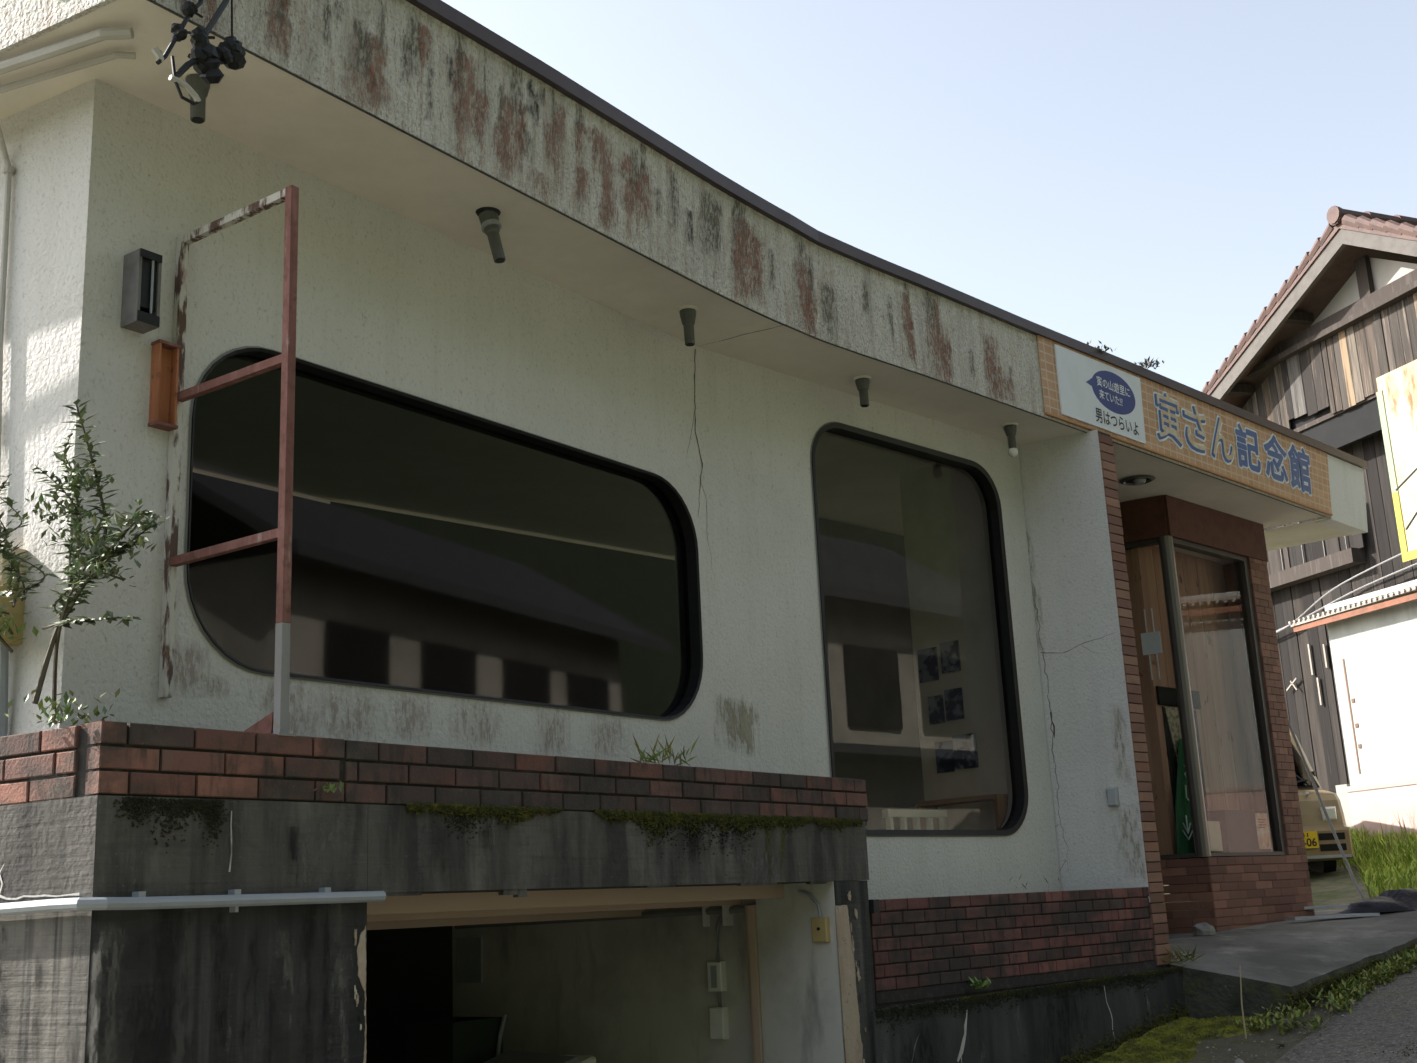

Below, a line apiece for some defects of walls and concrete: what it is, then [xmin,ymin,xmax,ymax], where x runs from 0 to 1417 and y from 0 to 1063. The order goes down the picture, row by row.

rust [348,1,390,104]
rust [455,33,526,175]
rust [533,91,649,228]
rust [731,200,762,298]
rust [796,241,817,331]
rust [901,283,952,381]
rust [984,335,1015,400]
crack [686,325,782,572]
leakage [720,701,755,751]
crack [1030,572,1113,870]
leakage [70,922,117,1063]
peeling [354,925,367,1063]